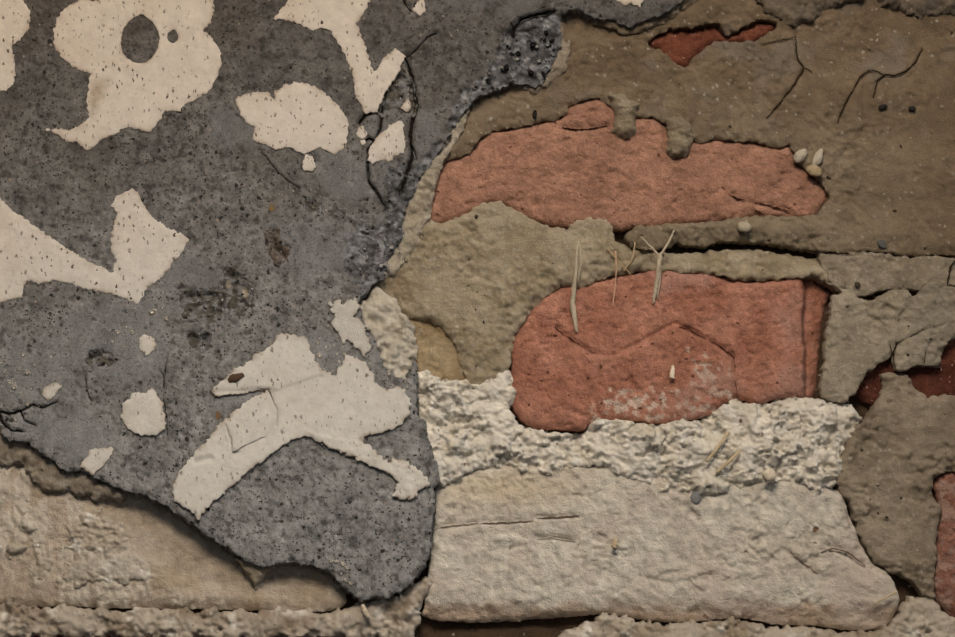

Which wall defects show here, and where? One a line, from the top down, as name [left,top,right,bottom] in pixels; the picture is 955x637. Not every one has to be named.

flaking render [376,67,419,119]
crack [358,32,437,208]
crack [761,36,812,117]
crack [837,48,923,123]
flaking render [431,99,827,233]
crack [0,401,57,432]
peeling [120,388,167,436]
flaking render [510,270,831,433]
flaking render [850,340,955,407]
peeling [80,447,114,475]
flaking render [0,464,370,612]
flaking render [421,465,899,631]